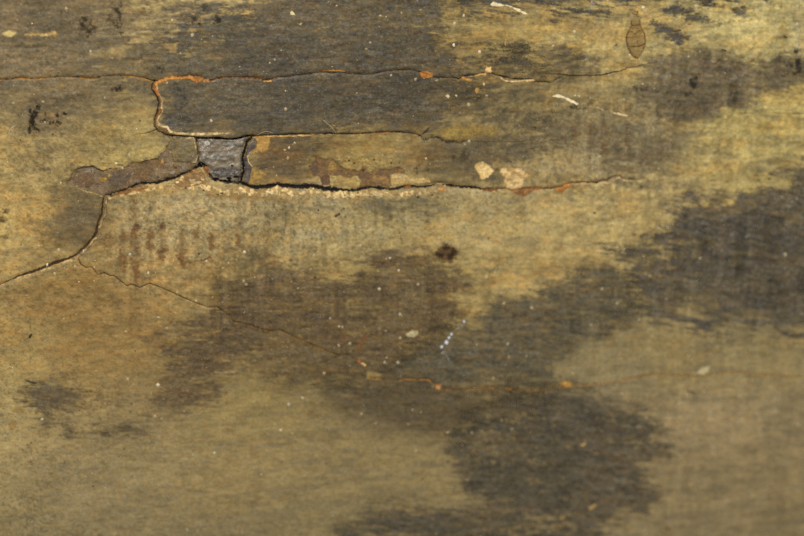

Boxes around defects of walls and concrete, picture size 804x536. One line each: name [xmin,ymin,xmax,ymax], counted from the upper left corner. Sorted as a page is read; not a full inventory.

water stain [0,0,682,177]
water stain [635,0,804,124]
spalling [66,134,270,199]
crack [0,65,641,308]
water stain [14,377,91,428]
water stain [142,158,804,536]
crack [234,321,799,392]